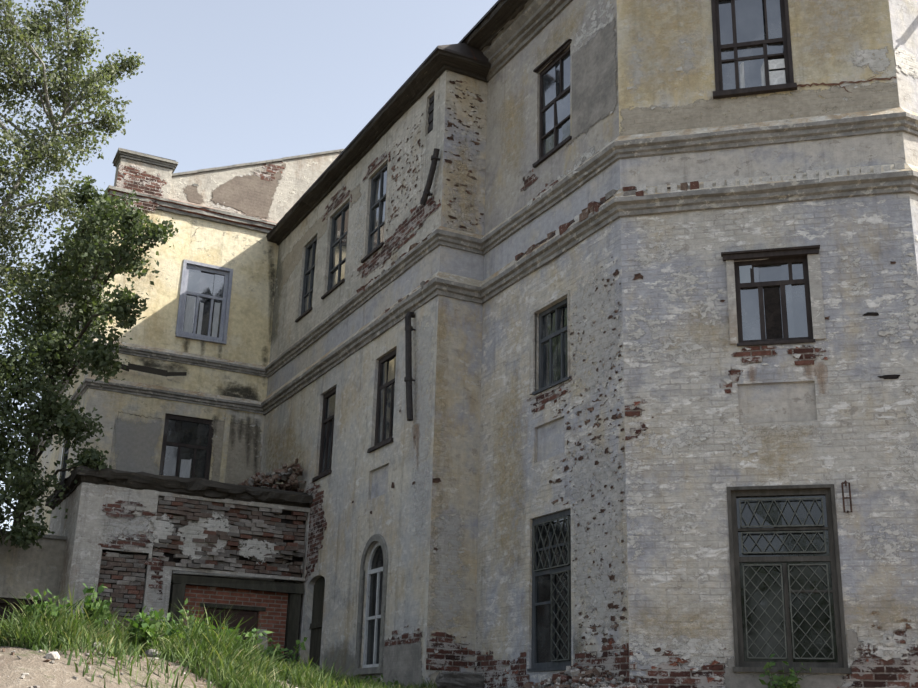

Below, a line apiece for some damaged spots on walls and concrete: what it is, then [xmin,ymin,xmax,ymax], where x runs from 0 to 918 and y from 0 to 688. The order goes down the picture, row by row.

spalling [240,161,285,181]
spalling [276,80,484,295]
spalling [719,345,829,393]
flaking render [527,256,726,688]
spalling [98,531,155,555]
spalling [305,481,327,582]
spalling [144,555,166,600]
flaking render [384,625,534,688]
flaking render [837,611,918,688]